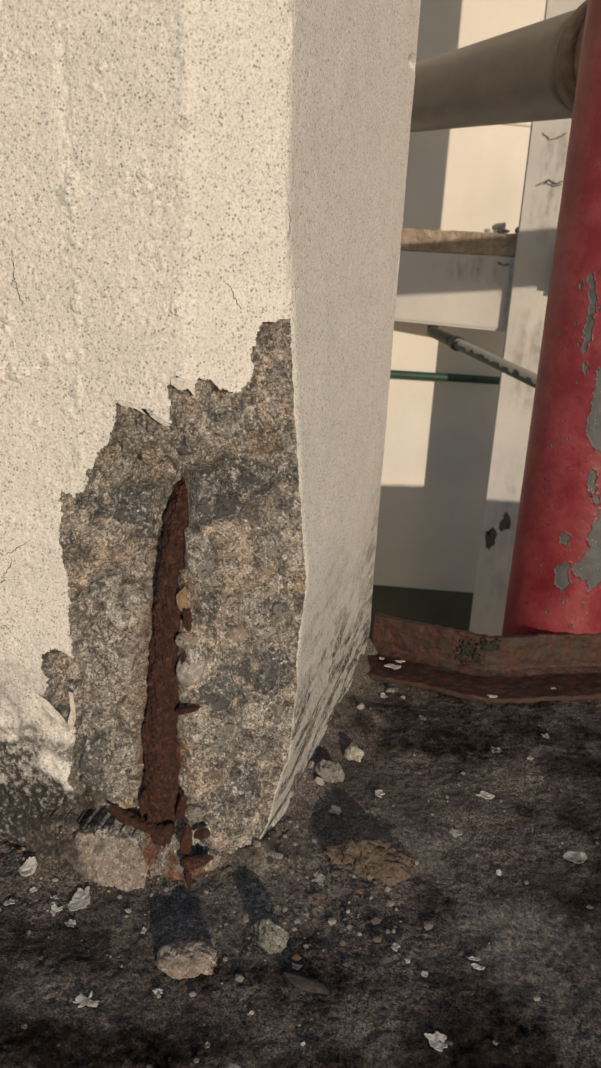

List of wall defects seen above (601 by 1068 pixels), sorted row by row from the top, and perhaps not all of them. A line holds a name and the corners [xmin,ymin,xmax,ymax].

peeling [558,272,601,453]
spalling [37,318,306,892]
peeling [541,468,601,615]